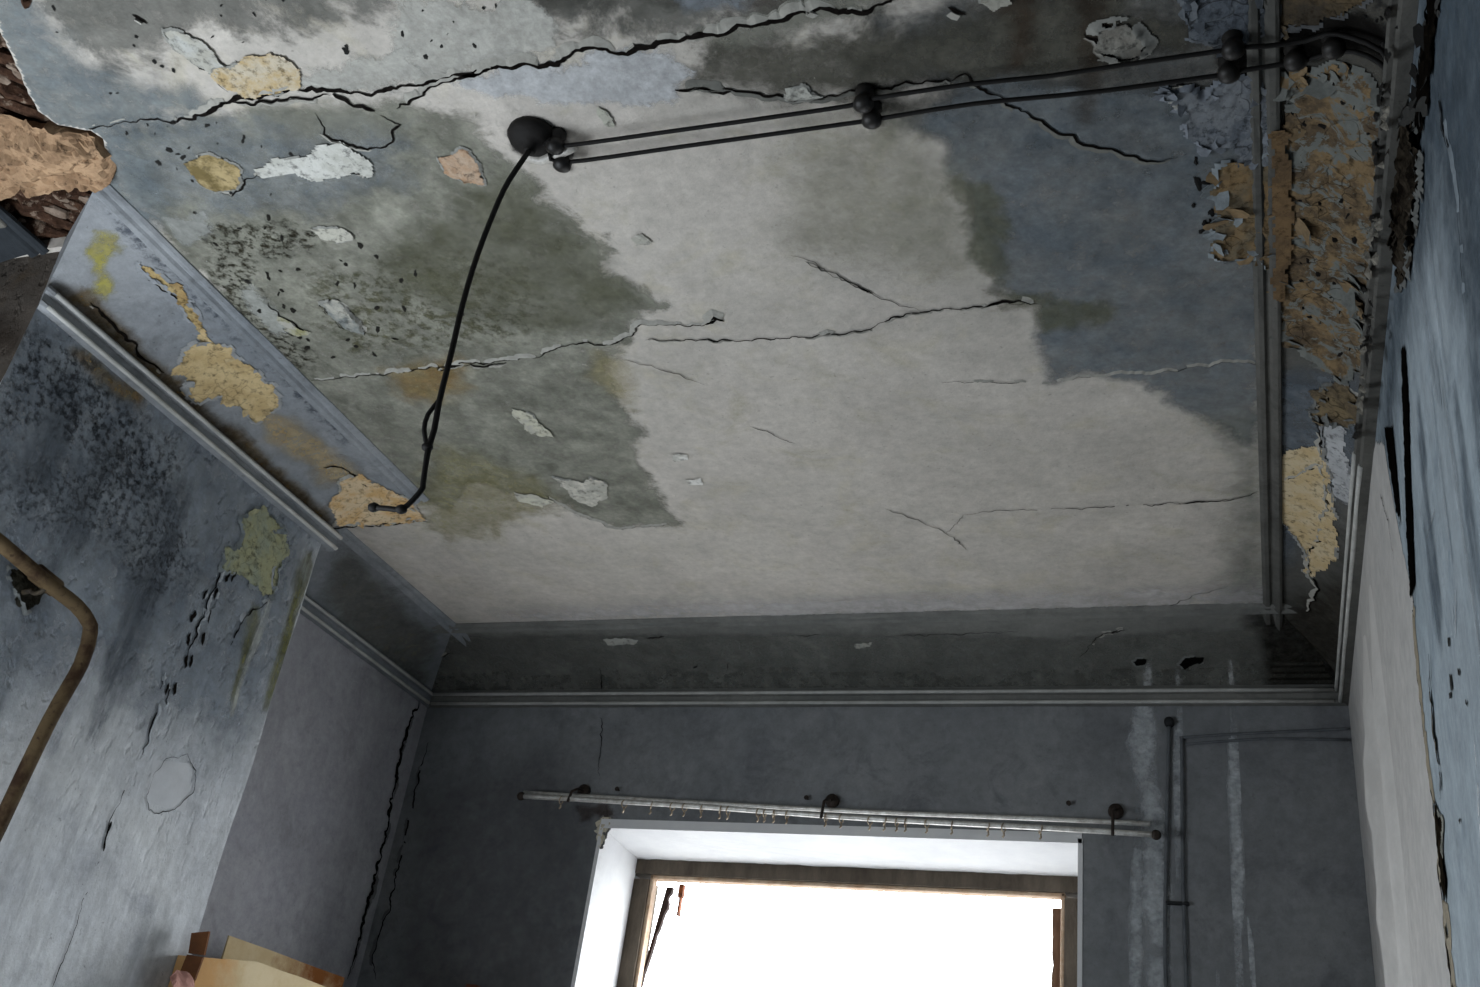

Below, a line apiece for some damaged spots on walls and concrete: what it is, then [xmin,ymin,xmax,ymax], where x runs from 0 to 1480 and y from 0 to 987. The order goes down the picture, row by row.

peeling [133,261,284,426]
peeling [146,120,374,196]
leakage [0,0,681,533]
crack [89,0,892,178]
crack [268,255,1036,385]
leakage [538,0,1258,443]
crack [676,73,1178,165]
leakage [0,302,311,728]
flaking render [328,474,425,529]
flaking render [1150,0,1451,987]
leakage [334,546,1342,690]
crack [1412,602,1456,987]